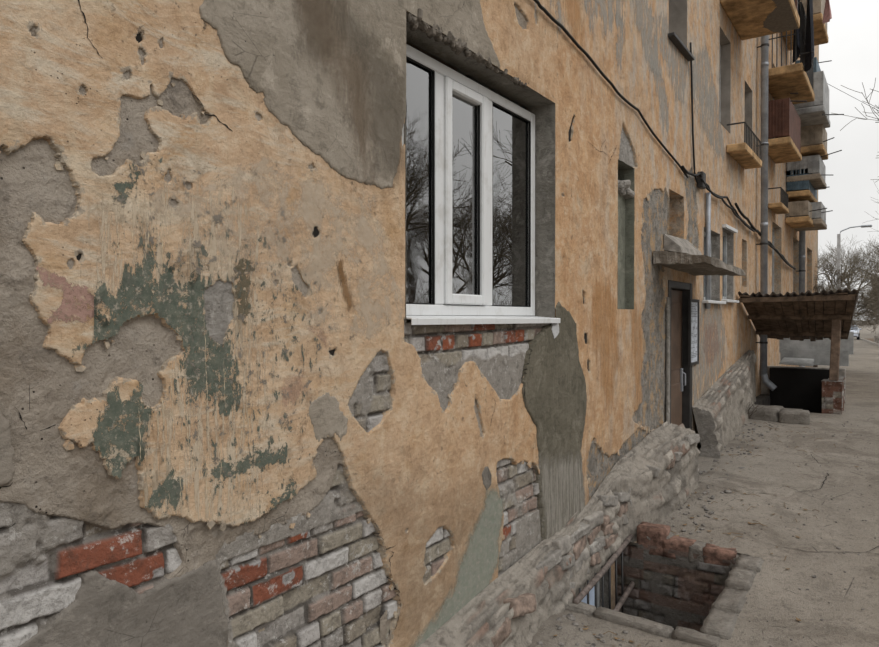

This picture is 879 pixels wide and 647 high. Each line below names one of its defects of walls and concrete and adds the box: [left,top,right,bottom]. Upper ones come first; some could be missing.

crack [78,0,102,58]
spalling [406,8,527,88]
flaking render [0,79,399,647]
flaking render [404,323,551,411]
flaking render [423,527,450,583]
flaking render [496,459,542,577]